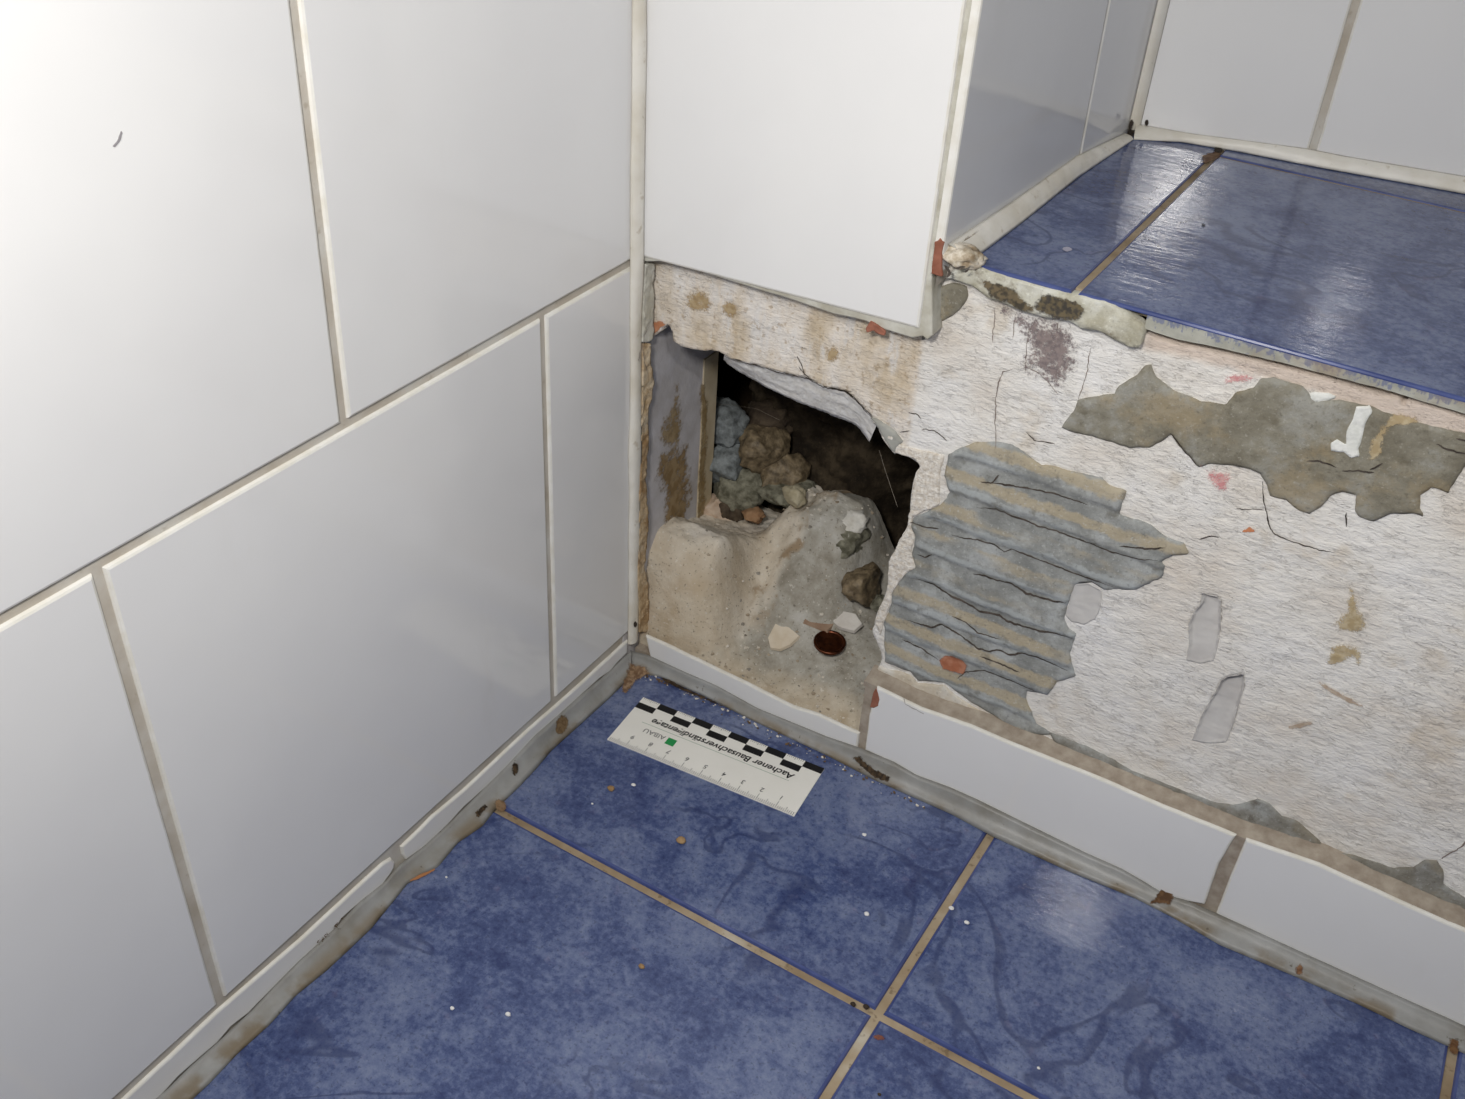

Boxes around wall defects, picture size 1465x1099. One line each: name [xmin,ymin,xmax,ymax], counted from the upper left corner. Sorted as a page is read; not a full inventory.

peeling [866,321,886,335]
flaking render [717,352,944,635]
spalling [1065,583,1102,625]
flaking render [768,624,800,651]